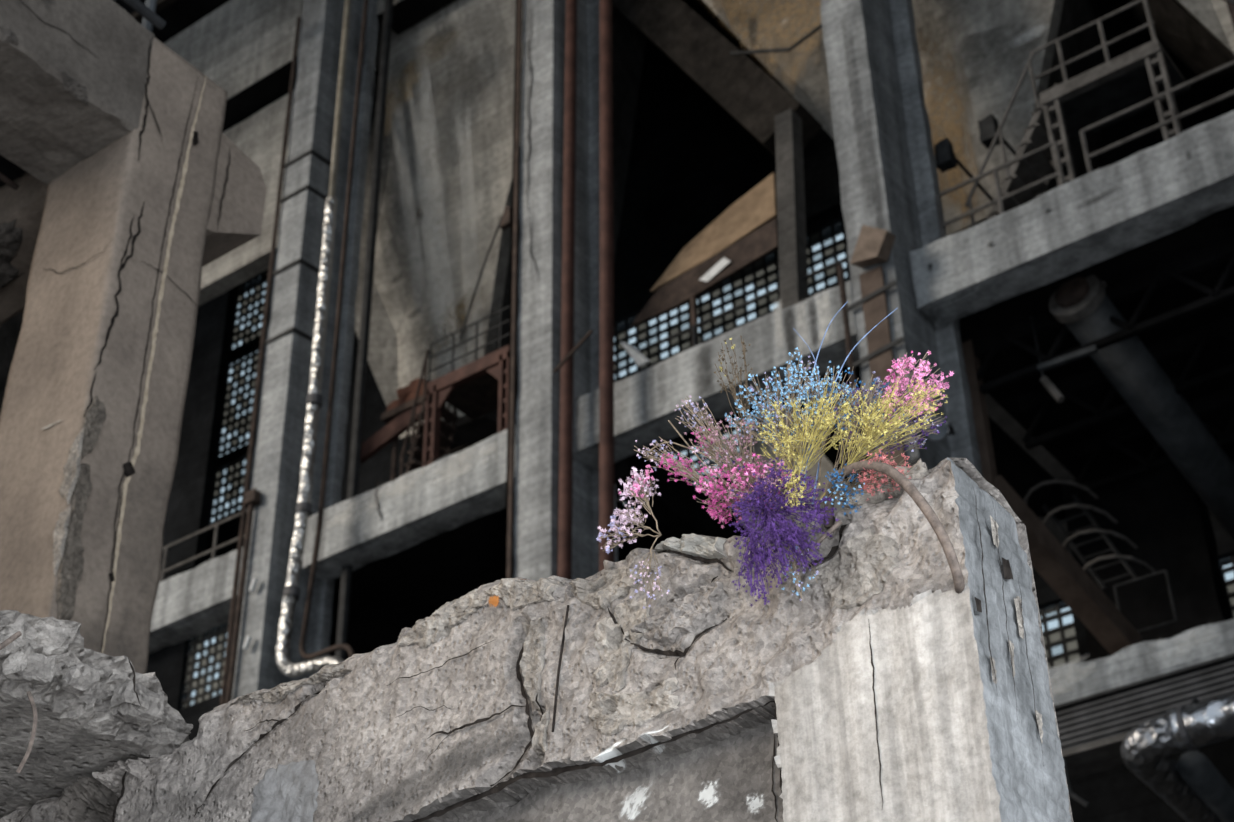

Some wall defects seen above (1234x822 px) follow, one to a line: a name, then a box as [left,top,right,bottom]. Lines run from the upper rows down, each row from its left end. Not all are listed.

crack [217,147,231,230]
crack [0,35,206,705]
spalling [53,395,107,620]
crack [607,607,727,670]
crack [194,678,329,817]
crack [386,639,783,822]